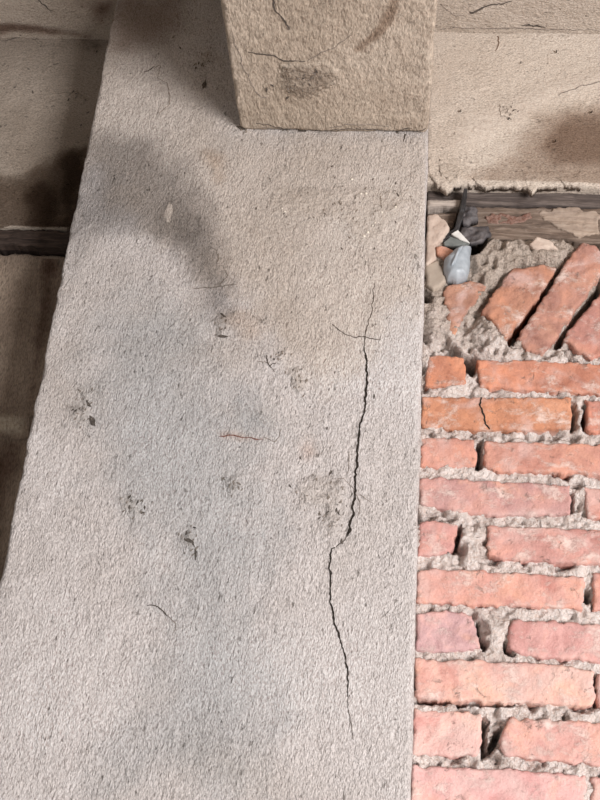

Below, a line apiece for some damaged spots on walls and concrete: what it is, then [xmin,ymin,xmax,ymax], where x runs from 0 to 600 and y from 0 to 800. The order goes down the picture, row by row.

crack [328,286,378,735]
crack [479,397,490,429]